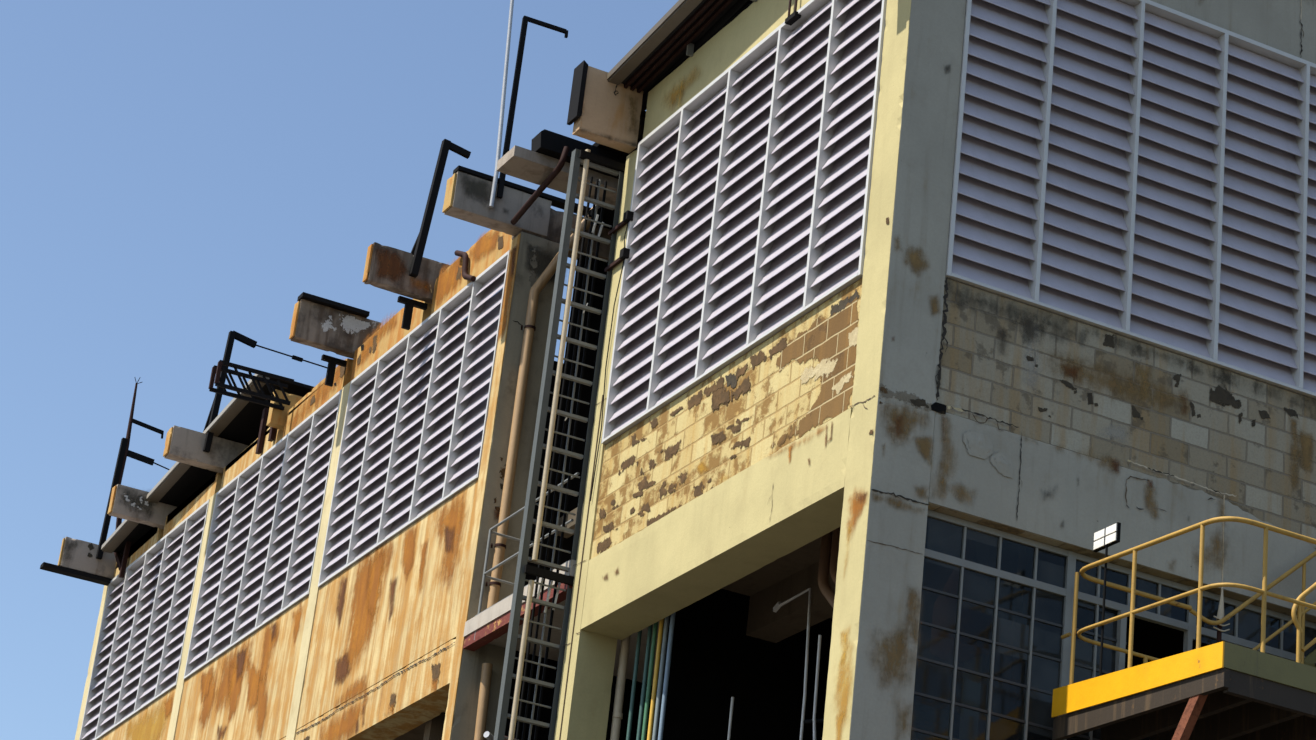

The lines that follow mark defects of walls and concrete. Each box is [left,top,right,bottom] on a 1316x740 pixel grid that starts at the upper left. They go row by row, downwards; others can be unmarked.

rust [376,249,406,281]
rust [417,231,516,337]
water stain [897,240,927,272]
peeling [291,314,396,429]
peeling [597,289,859,554]
water stain [1103,334,1122,348]
water stain [1061,360,1200,409]
water stain [1210,371,1241,409]
rust [293,611,302,643]
rust [320,497,464,740]
rust [199,624,278,740]
rust [837,633,850,740]